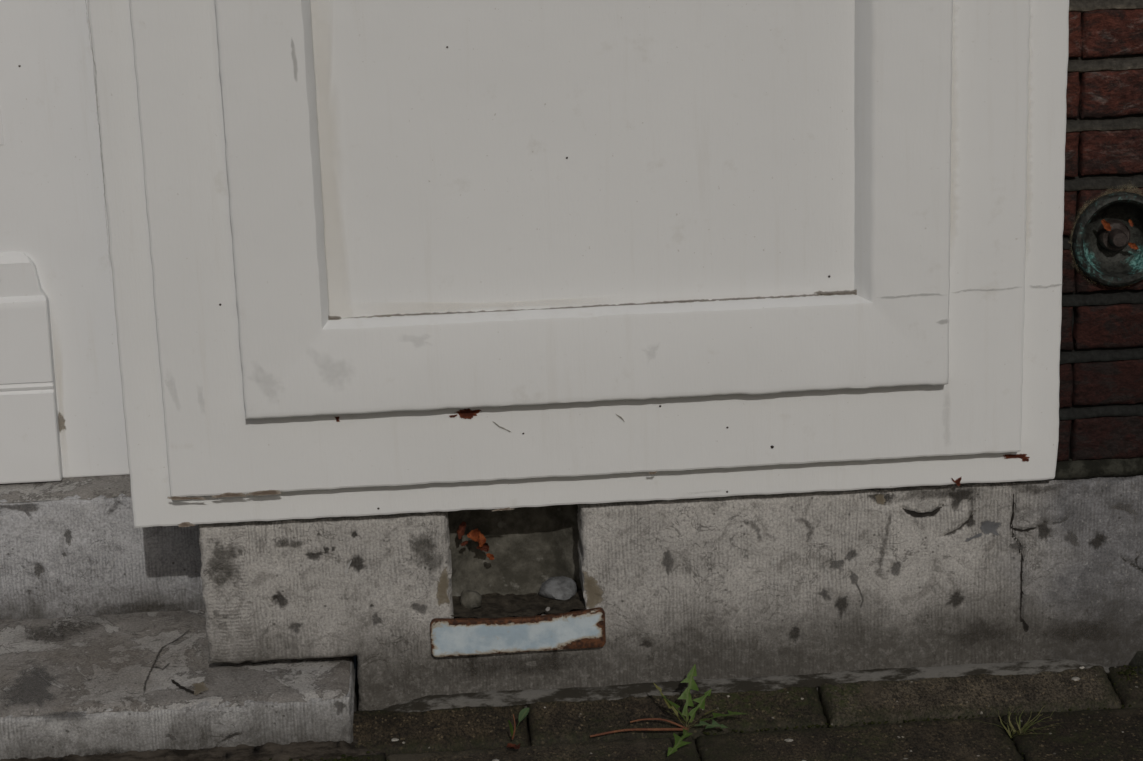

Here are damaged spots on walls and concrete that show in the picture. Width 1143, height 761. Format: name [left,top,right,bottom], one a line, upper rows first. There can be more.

crack [903,506,975,536]
crack [1010,494,1068,632]